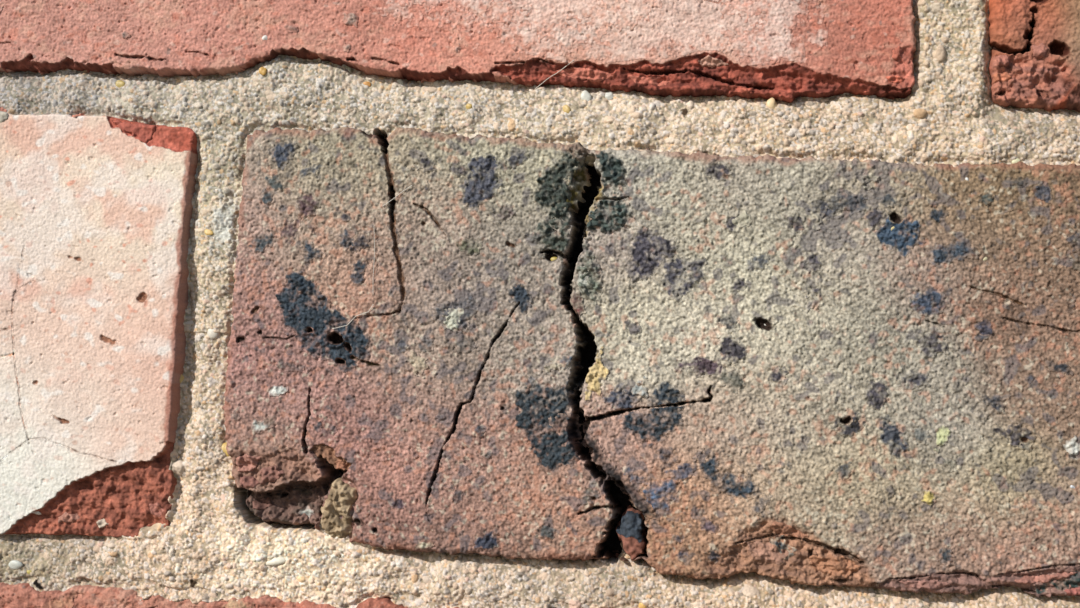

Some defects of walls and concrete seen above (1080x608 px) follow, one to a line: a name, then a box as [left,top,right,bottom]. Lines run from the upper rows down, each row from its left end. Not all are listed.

spalling [1,53,121,75]
spalling [239,47,360,71]
spalling [398,41,916,103]
spalling [988,0,1080,112]
crack [355,130,446,319]
crack [264,333,296,341]
crack [350,356,381,367]
crack [540,154,713,561]
crack [425,302,520,521]
spalling [1,441,177,537]
spalling [226,437,351,526]
spalling [696,513,1080,598]